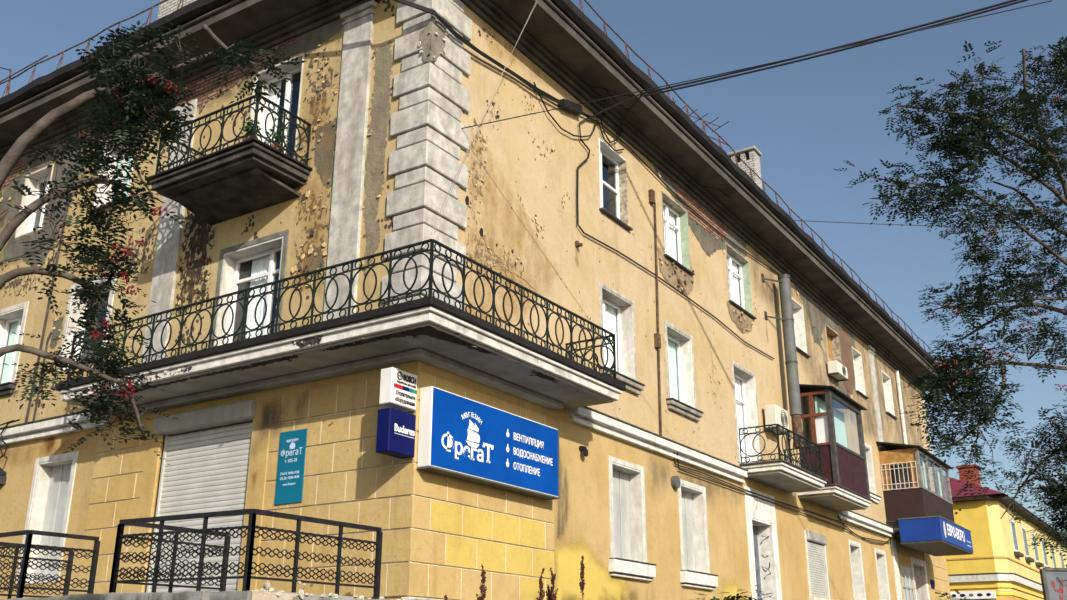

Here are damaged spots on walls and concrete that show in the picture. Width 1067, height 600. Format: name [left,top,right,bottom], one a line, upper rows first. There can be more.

flaking render [0,19,343,296]
peeling [465,100,522,283]
peeling [173,209,215,314]
flaking render [658,247,694,296]
flaking render [727,301,754,333]
flaking render [251,581,338,600]